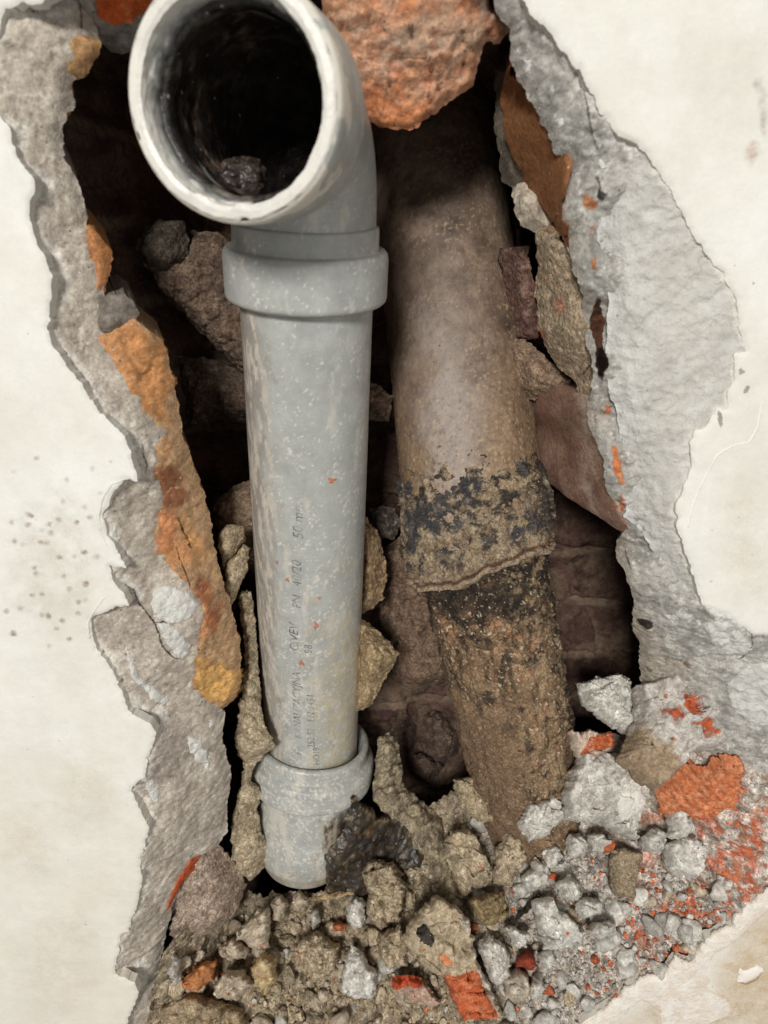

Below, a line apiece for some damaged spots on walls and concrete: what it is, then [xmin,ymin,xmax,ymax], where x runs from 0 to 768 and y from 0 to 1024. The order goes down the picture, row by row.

spalling [310,0,768,774]
spalling [0,0,264,1024]
spalling [358,670,469,815]
spalling [244,868,327,897]
peeling [574,887,768,1024]